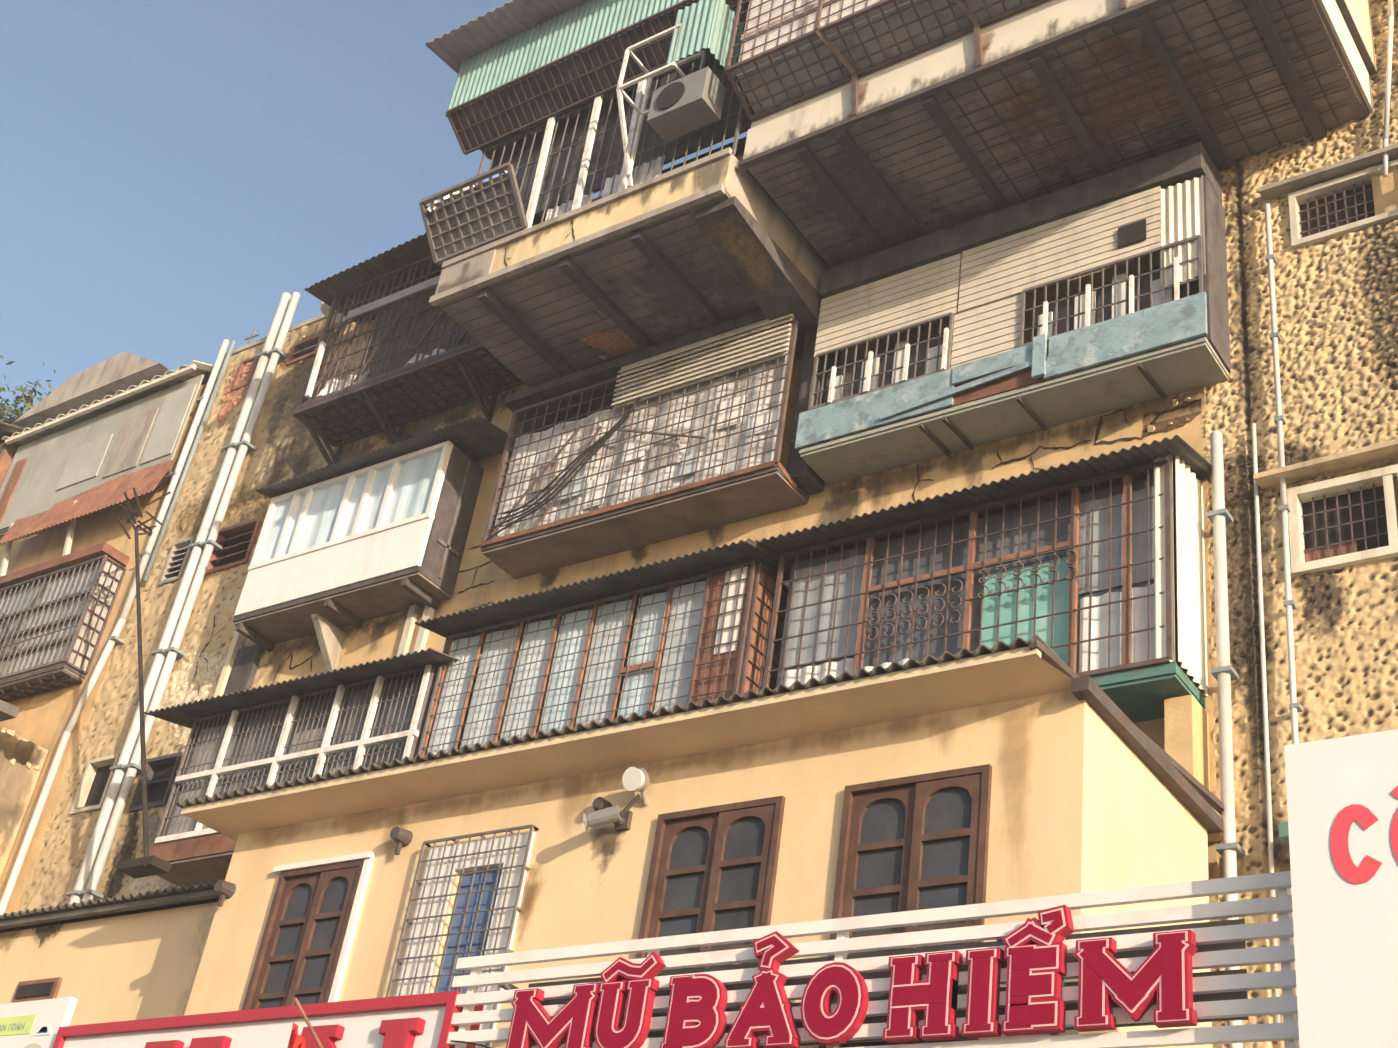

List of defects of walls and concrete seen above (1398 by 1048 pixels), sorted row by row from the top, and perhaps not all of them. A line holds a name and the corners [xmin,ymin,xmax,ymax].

water stain [1370,0,1398,105]
water stain [1362,218,1398,390]
crack [991,399,1202,470]
water stain [594,829,620,866]